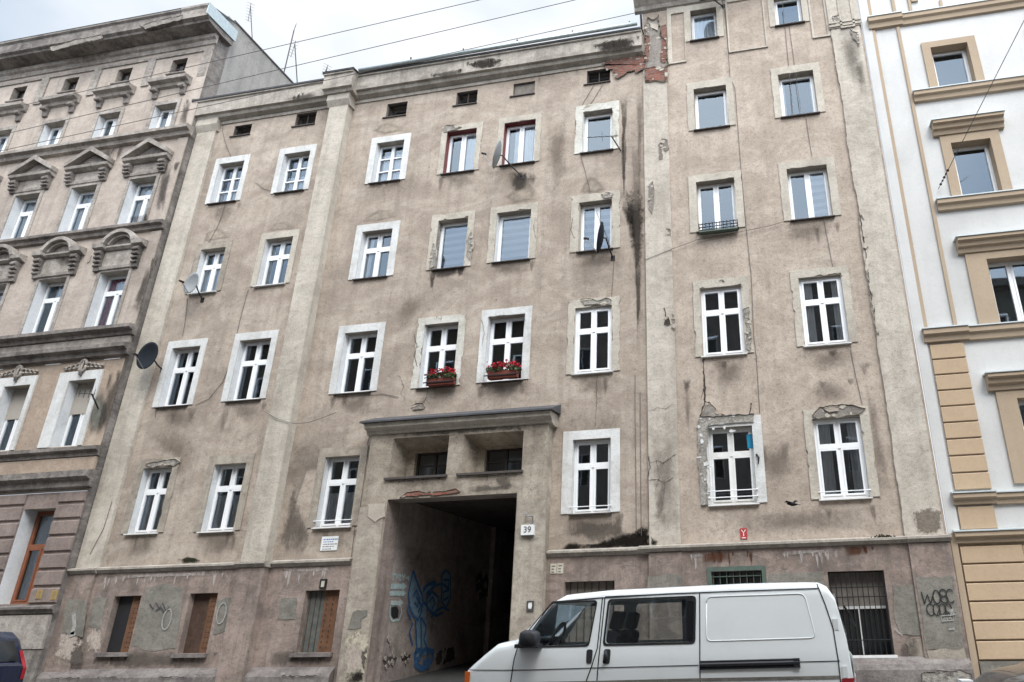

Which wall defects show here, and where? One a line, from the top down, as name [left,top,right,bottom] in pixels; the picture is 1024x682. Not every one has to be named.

flaking render [594,15,669,83]
peeling [658,139,669,160]
leakage [513,174,530,190]
peeling [647,181,655,213]
leakage [624,196,643,316]
crack [859,213,879,335]
crack [698,359,706,416]
flaking render [812,403,866,419]
flaking render [696,401,754,505]
leakage [565,523,657,549]
peeling [54,628,102,666]